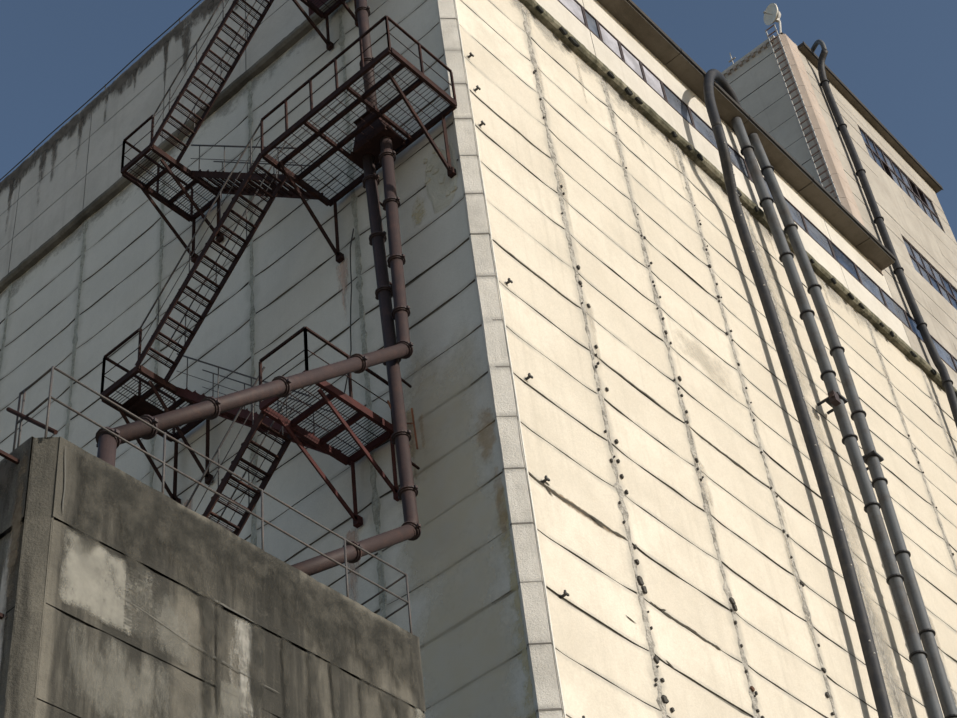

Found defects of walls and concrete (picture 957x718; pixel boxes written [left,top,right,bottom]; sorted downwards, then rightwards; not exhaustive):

leakage [0,0,223,222]
leakage [61,455,422,718]